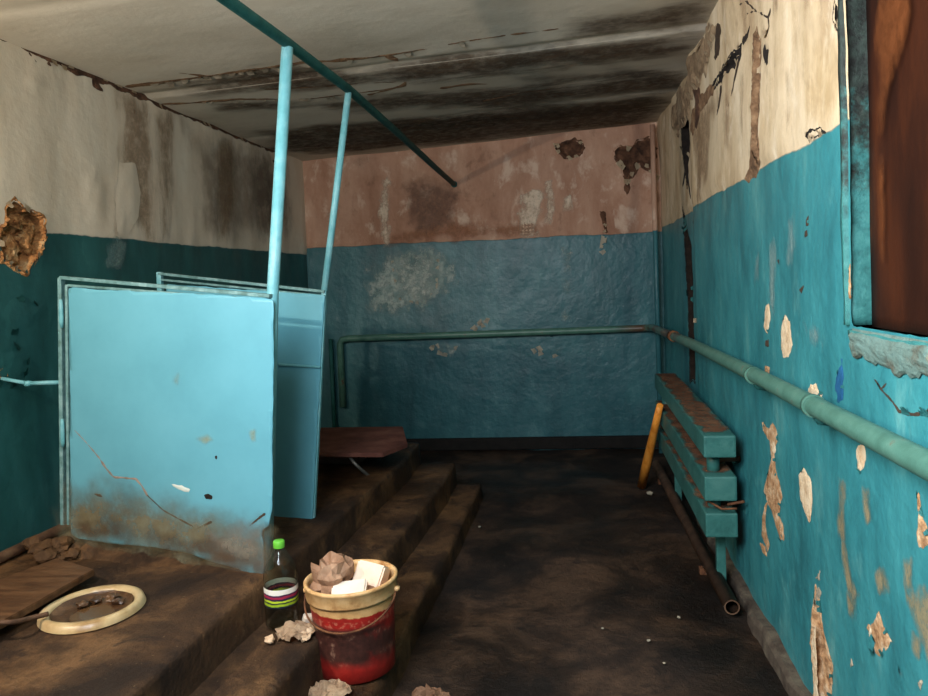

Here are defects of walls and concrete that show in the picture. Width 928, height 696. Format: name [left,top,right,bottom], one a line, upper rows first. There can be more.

leakage [580,6,704,33]
leakage [198,71,280,93]
leakage [287,71,681,153]
leakage [291,40,689,90]
flaking render [671,23,769,183]
leakage [125,100,150,228]
flaking render [0,196,48,277]
crack [874,379,928,418]
crack [147,495,212,526]
peeling [760,422,784,556]
peeling [799,468,812,523]
flaking render [809,570,833,696]